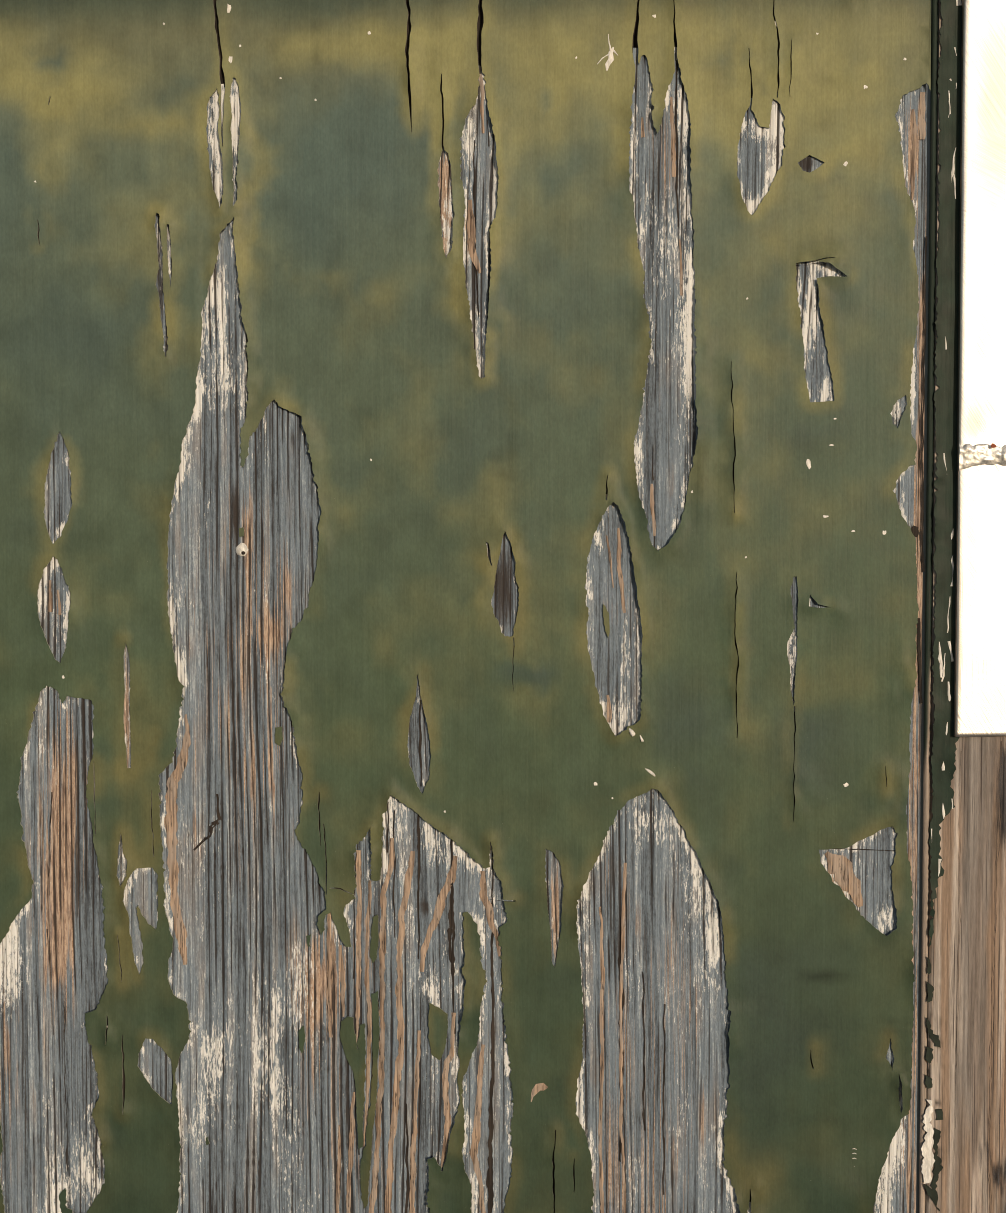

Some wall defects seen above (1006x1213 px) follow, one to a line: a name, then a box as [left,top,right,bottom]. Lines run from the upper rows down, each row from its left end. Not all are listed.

crack [213,0,225,87]
crack [404,0,412,131]
crack [438,75,446,144]
crack [476,0,484,66]
crack [632,0,640,53]
peeling [629,47,698,551]
peeling [117,65,519,1213]
peeling [585,494,643,736]
peeling [819,0,964,1213]
peeling [0,433,108,1213]
peeling [545,788,751,1213]
water stain [981,1146,1006,1194]